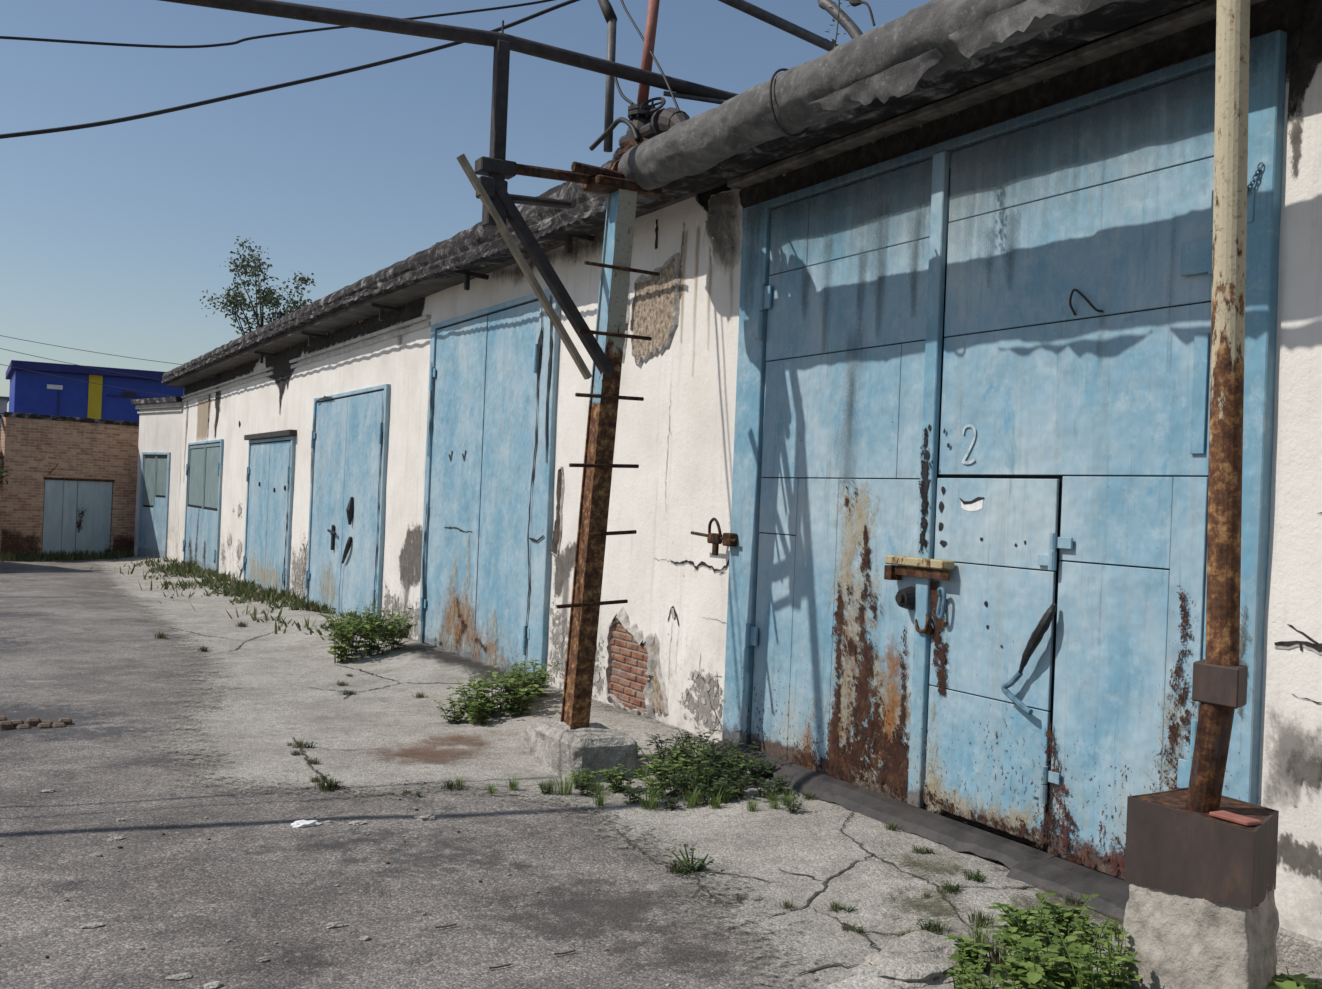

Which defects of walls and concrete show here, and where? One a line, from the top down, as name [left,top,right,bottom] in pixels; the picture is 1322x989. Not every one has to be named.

water stain [681,19,1216,300]
spalling [622,252,681,369]
water stain [399,524,423,615]
rust [439,534,505,666]
water stain [553,541,576,651]
spalling [592,607,724,735]
crack [654,558,729,575]
rust [792,480,1126,880]
rust [1147,585,1202,792]
rust [1239,604,1251,666]
crack [1274,624,1322,655]
crack [611,811,1035,976]